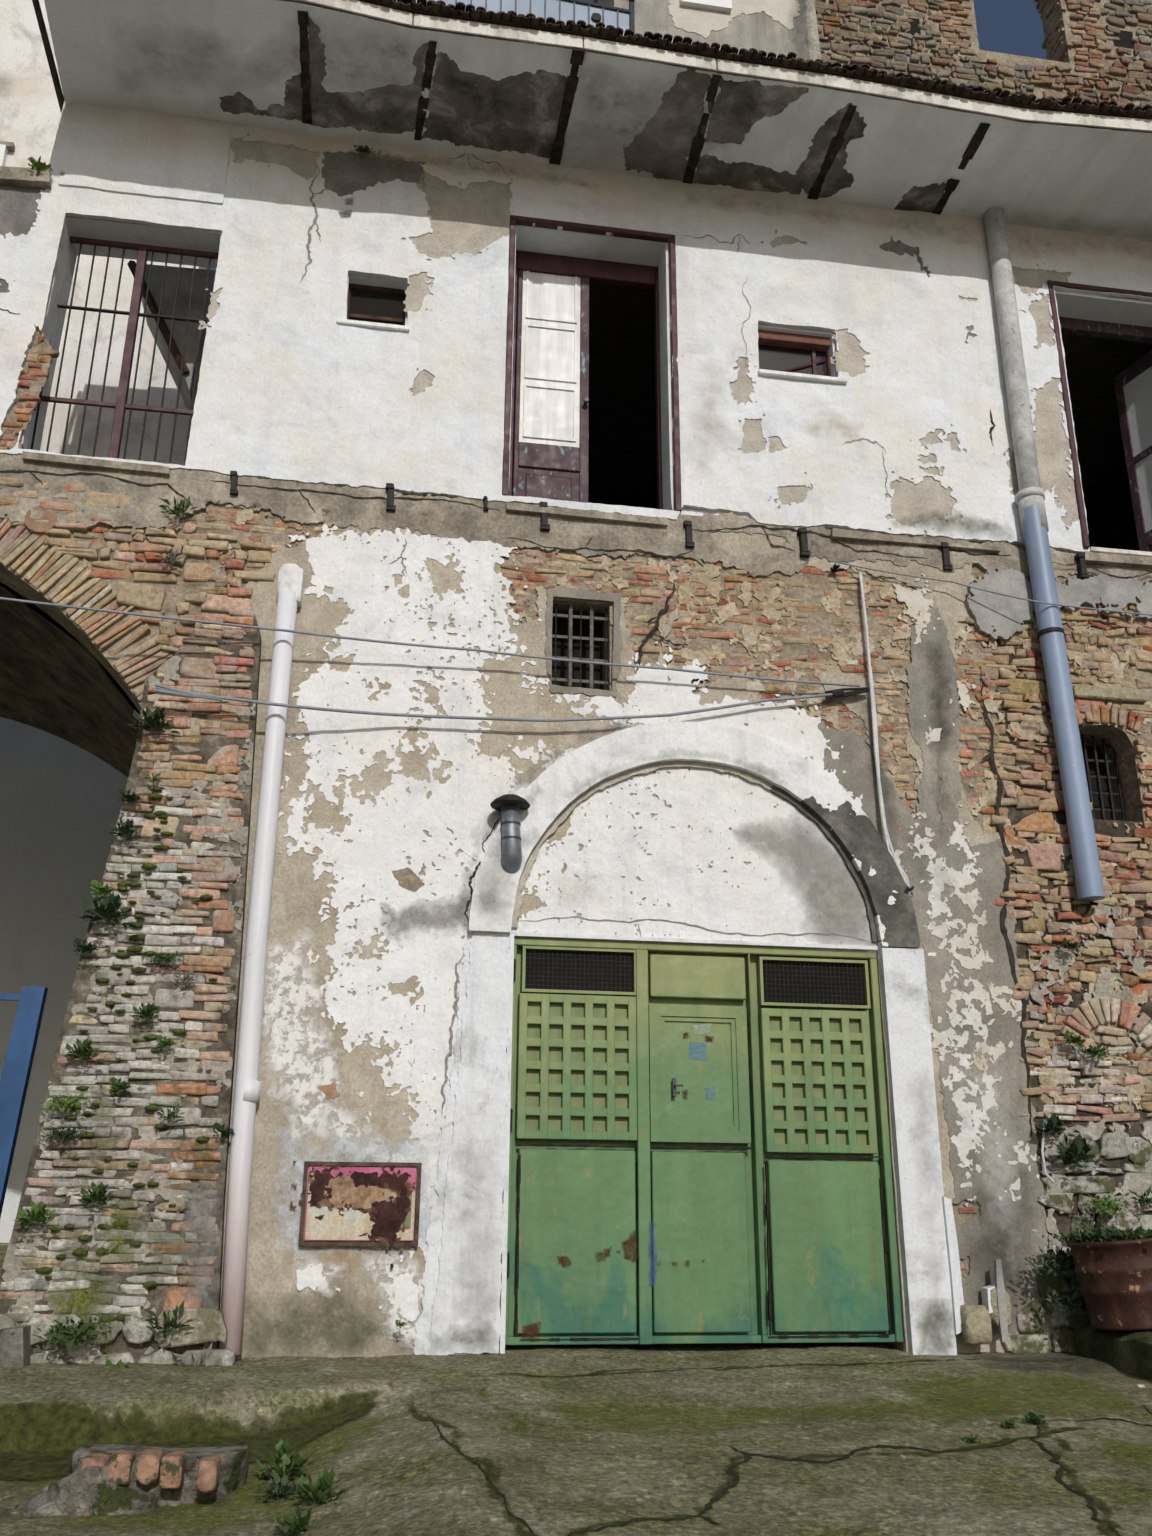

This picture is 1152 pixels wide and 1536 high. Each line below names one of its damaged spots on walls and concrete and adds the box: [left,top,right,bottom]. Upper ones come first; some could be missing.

peeling [668,0,800,39]
peeling [220,16,567,313]
crack [300,168,336,283]
spalling [0,329,59,450]
crack [0,470,1008,671]
peeling [300,647,622,843]
damp [935,652,948,739]
spalling [500,548,1040,1228]
damp [747,827,867,939]
rust [289,1161,416,1269]
rust [598,1232,638,1261]
rust [523,1323,539,1338]